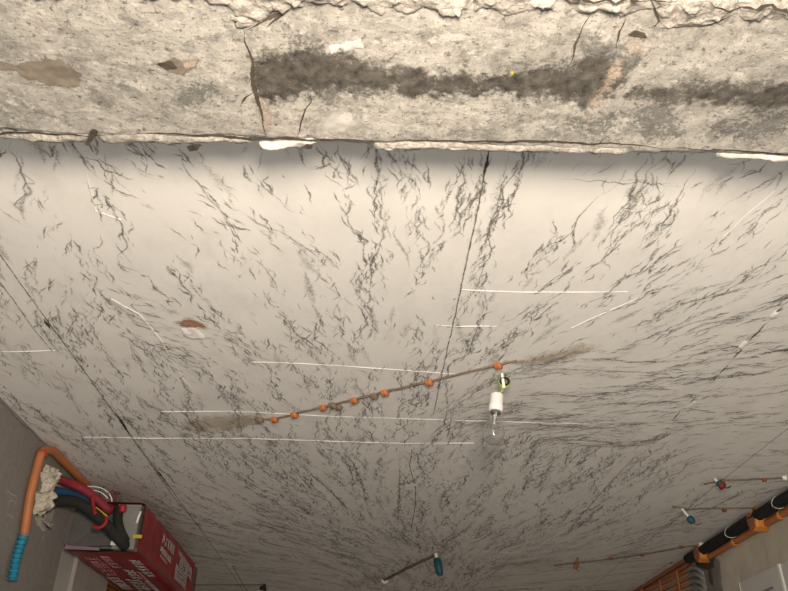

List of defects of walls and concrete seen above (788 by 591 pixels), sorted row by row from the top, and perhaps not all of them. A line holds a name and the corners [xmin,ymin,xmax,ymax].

spalling [207,0,788,29]
spalling [628,30,647,52]
leakage [0,59,82,88]
spalling [157,57,198,75]
crack [0,0,377,142]
leakage [247,26,788,144]
crack [397,139,788,156]
rust [176,318,205,329]